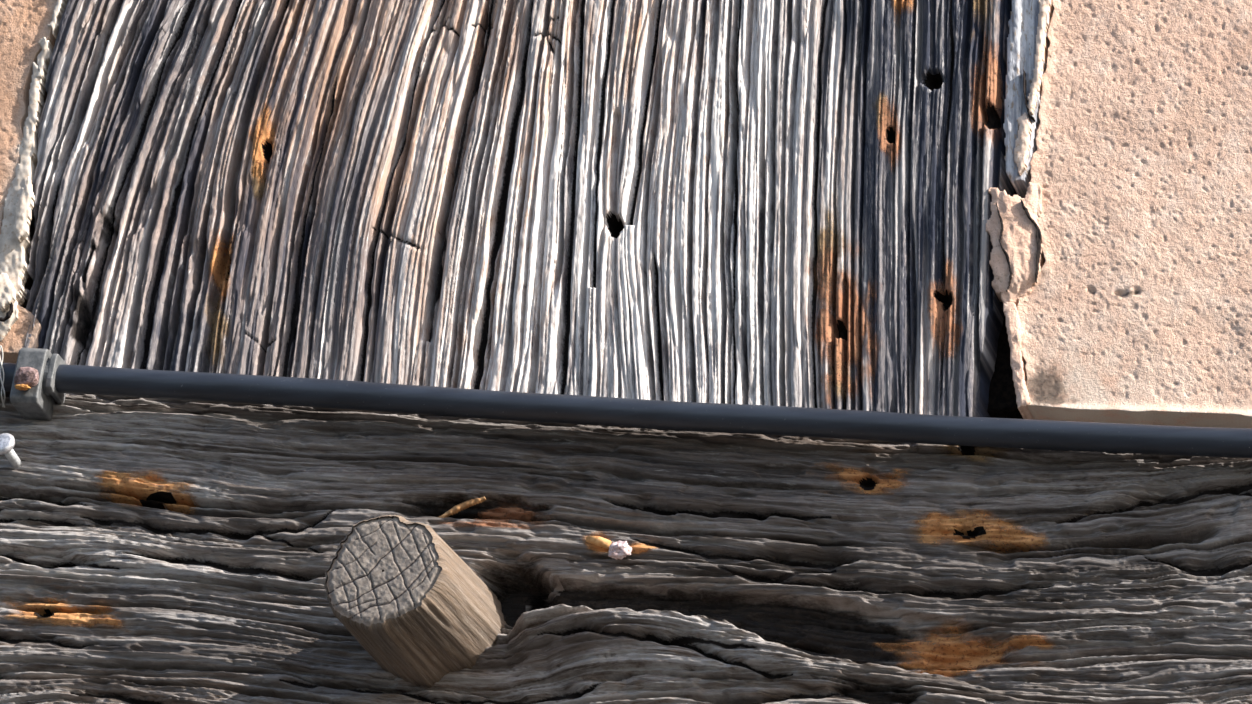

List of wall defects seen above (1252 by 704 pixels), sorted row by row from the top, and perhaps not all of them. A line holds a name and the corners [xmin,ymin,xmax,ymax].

rust [894,0,914,17]
peeling [0,0,68,342]
rust [876,96,902,168]
peeling [986,0,1053,306]
rust [815,211,876,398]
rust [928,263,961,356]
rust [100,471,195,515]
rust [448,507,541,528]
rust [829,466,904,494]
rust [916,512,1046,554]
rust [6,597,122,626]
rust [878,626,1053,677]